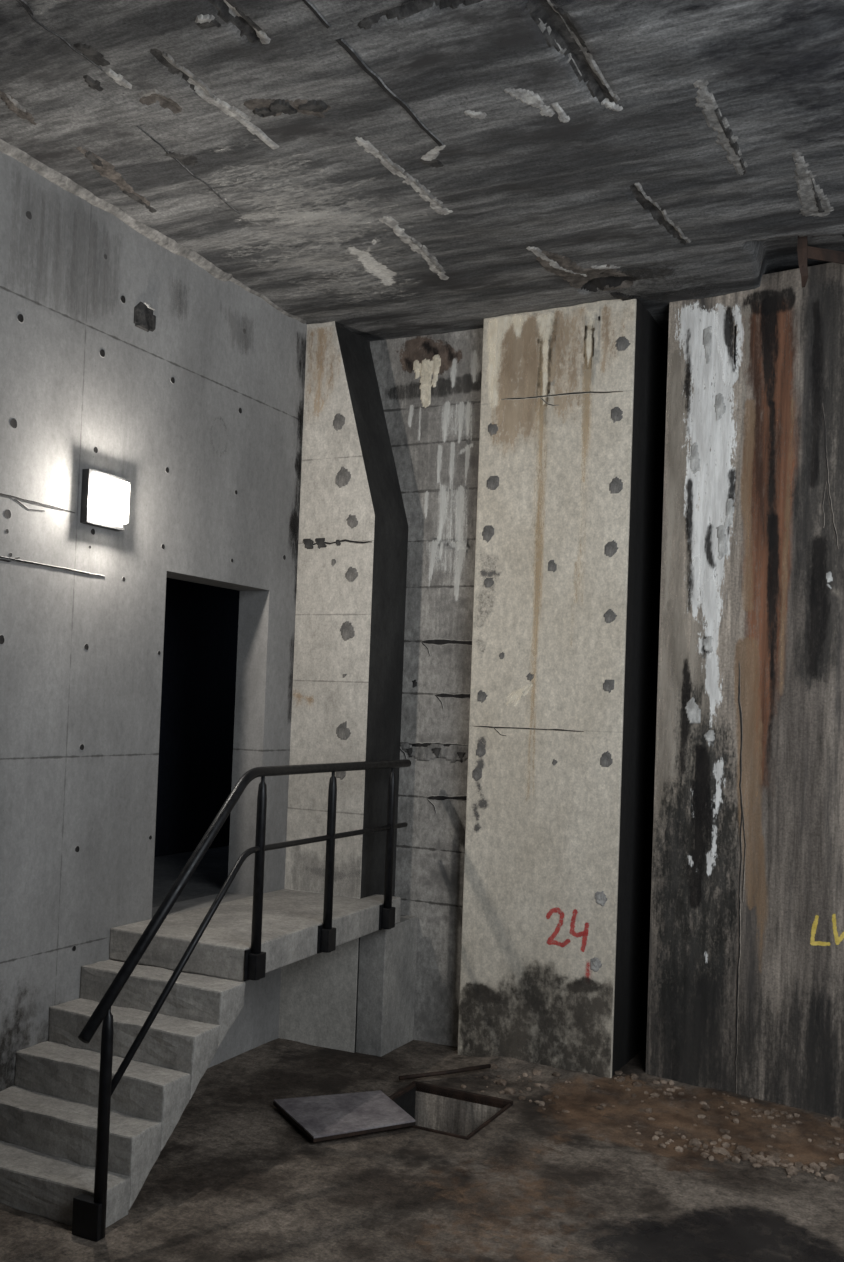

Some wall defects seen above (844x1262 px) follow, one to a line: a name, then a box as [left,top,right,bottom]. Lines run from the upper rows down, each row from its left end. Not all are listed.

spalling [150,49,332,149]
spalling [525,0,623,111]
crack [137,126,240,214]
spalling [355,137,453,215]
crack [0,492,75,514]
water stain [388,307,613,601]
corrosion [583,348,591,453]
crack [0,556,105,577]
peeling [675,302,744,876]
corrosion [735,287,795,948]
water stain [647,281,844,1119]
water stain [459,966,613,1078]